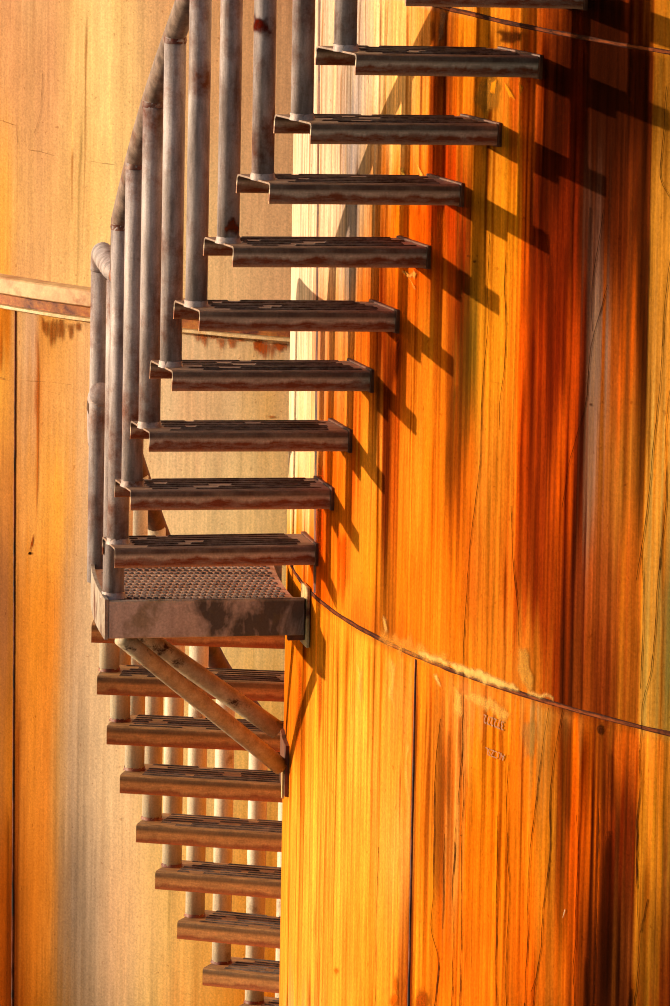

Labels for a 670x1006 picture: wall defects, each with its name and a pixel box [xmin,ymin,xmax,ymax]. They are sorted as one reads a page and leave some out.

crack [660,86,670,197]
rust [42,319,80,344]
crack [634,262,670,1004]
crack [495,708,563,1006]
crack [573,812,599,1006]